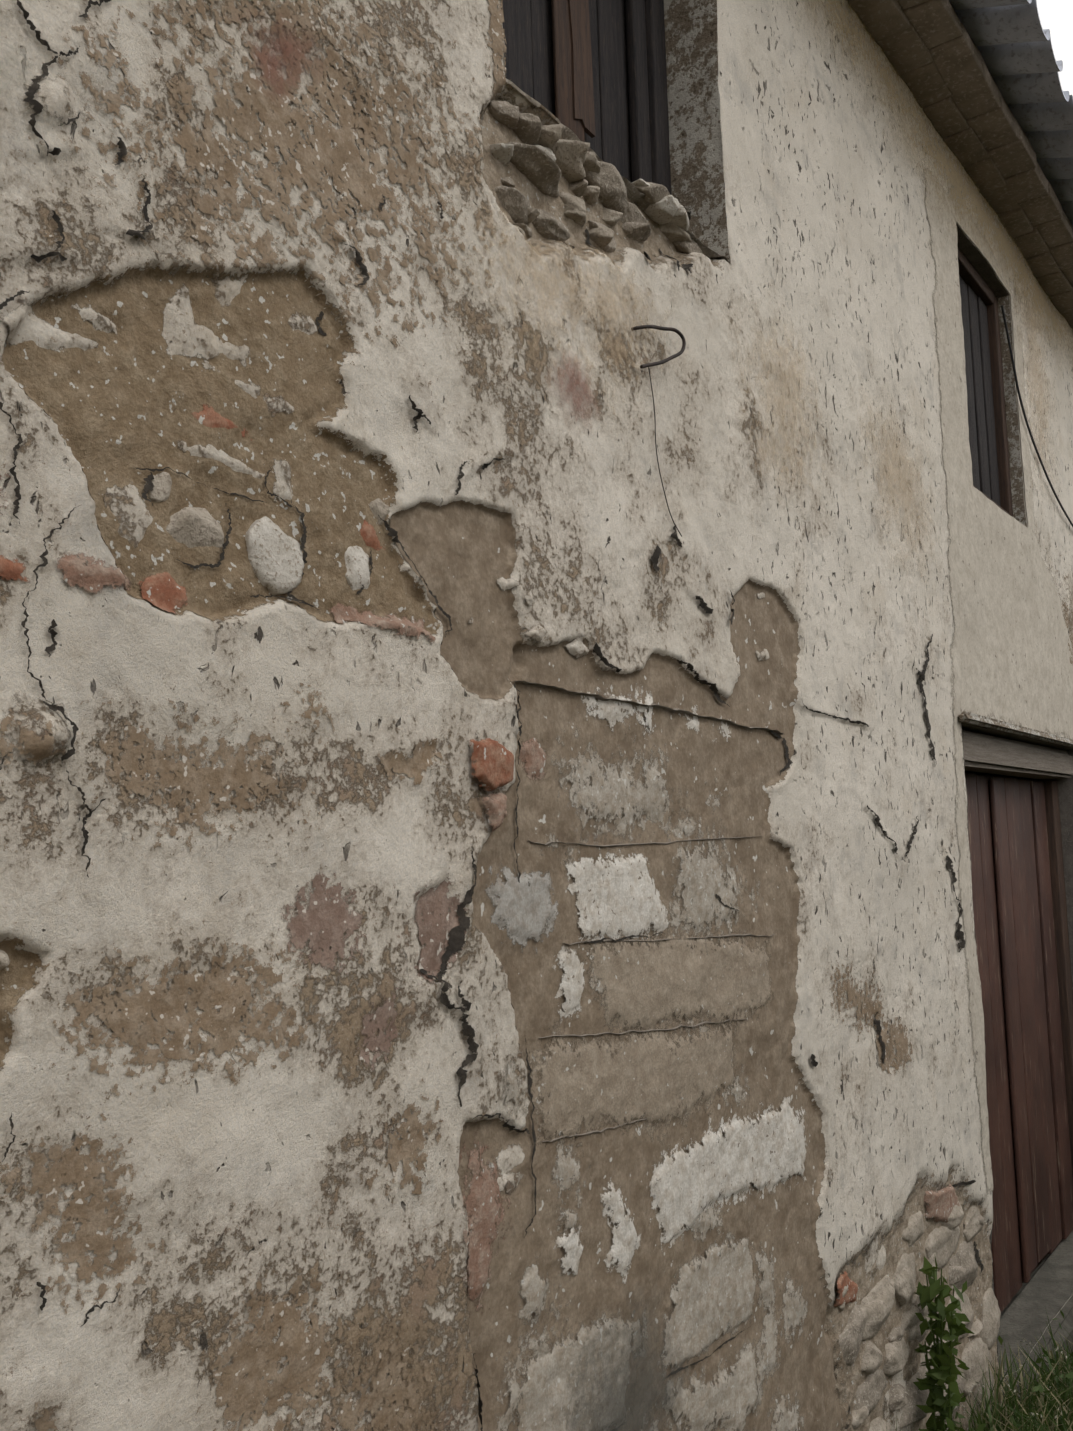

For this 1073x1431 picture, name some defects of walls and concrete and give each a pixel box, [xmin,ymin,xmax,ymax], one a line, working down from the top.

crack [17,0,111,156]
crack [115,137,153,240]
spalling [2,0,724,645]
crack [0,402,80,703]
peeling [576,683,662,739]
crack [917,634,936,760]
crack [867,805,966,952]
crack [419,851,479,1107]
flaking render [0,858,376,1325]
peeling [517,1196,584,1325]
peeling [600,1180,641,1284]
spalling [824,1166,1022,1431]